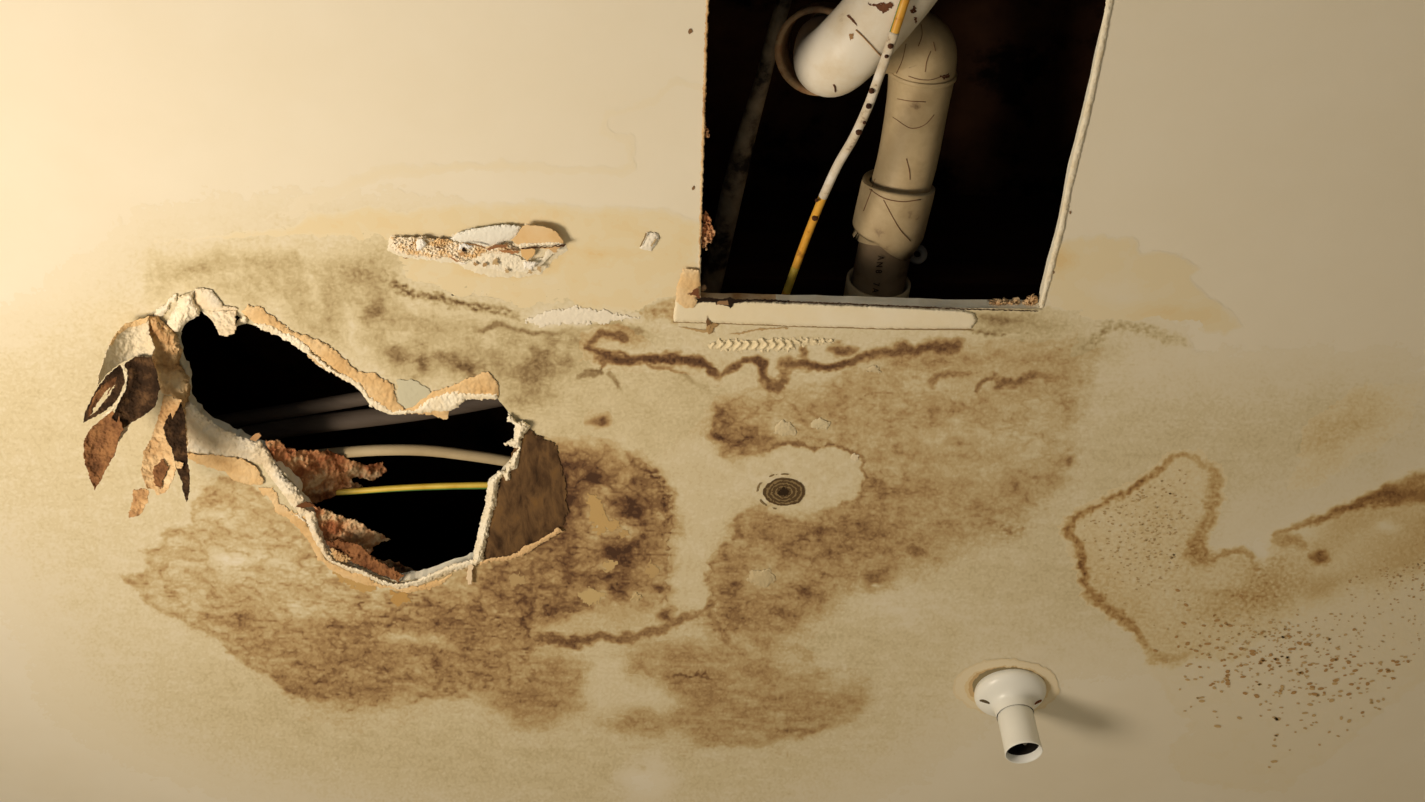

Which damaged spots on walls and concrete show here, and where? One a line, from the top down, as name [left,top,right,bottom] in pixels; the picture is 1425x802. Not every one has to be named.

damp [175,76,703,316]
peeling [194,288,238,311]
peeling [525,305,640,328]
flaking render [185,401,467,607]
peeling [509,572,527,586]
damp [0,184,1425,802]